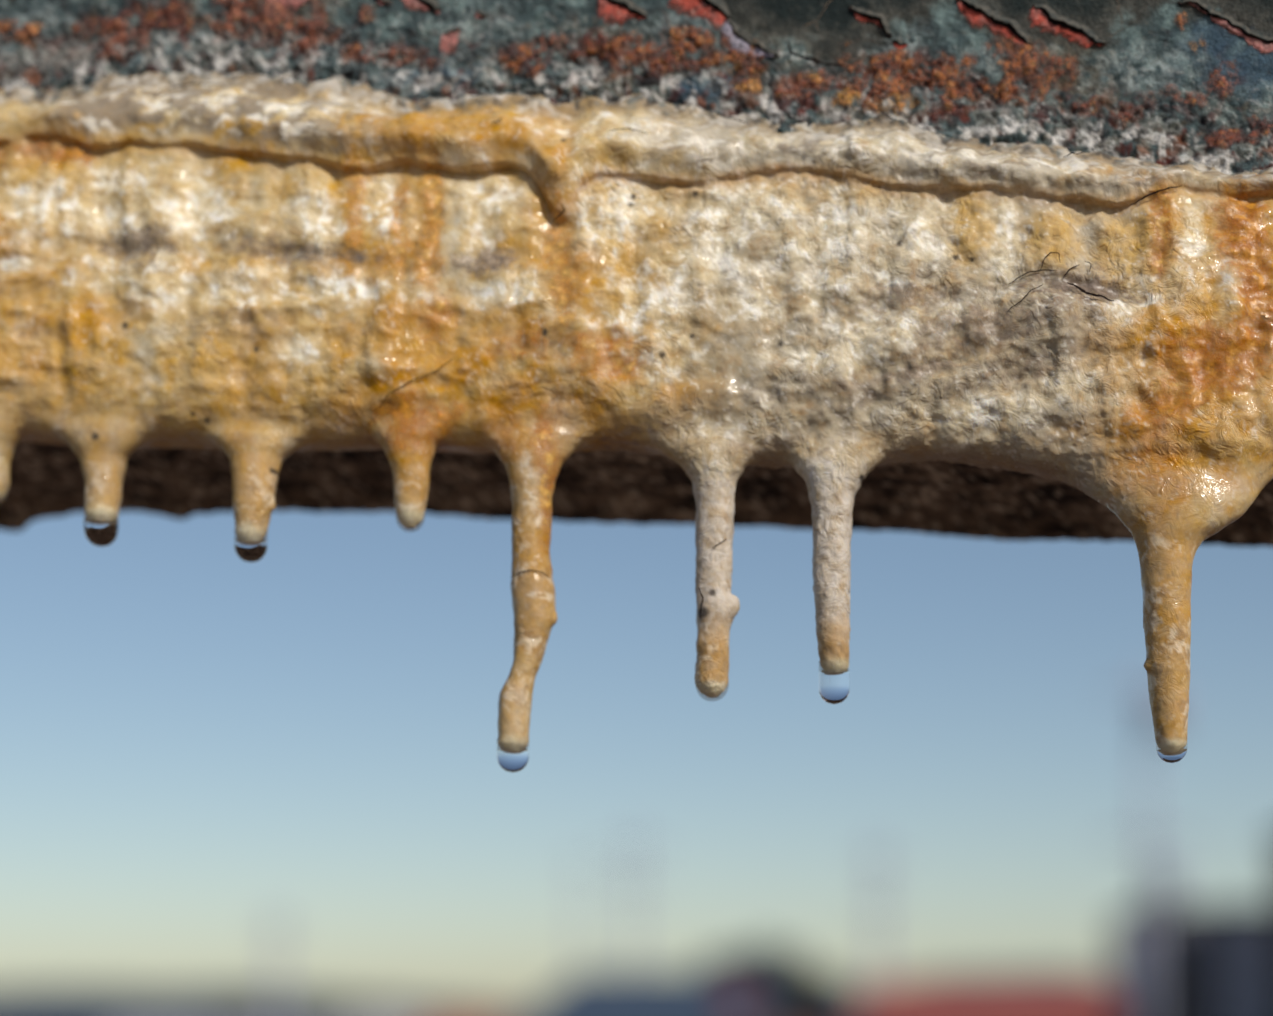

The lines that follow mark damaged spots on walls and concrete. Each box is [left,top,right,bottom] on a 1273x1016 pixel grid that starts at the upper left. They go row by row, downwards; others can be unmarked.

corrosion [73,0,327,60]
peeling [849,5,908,49]
peeling [957,0,1107,48]
peeling [1177,0,1273,53]
corrosion [499,26,1080,122]
corrosion [1205,116,1273,149]
corrosion [388,163,443,281]
corrosion [1143,184,1273,420]
leakage [0,70,1273,749]